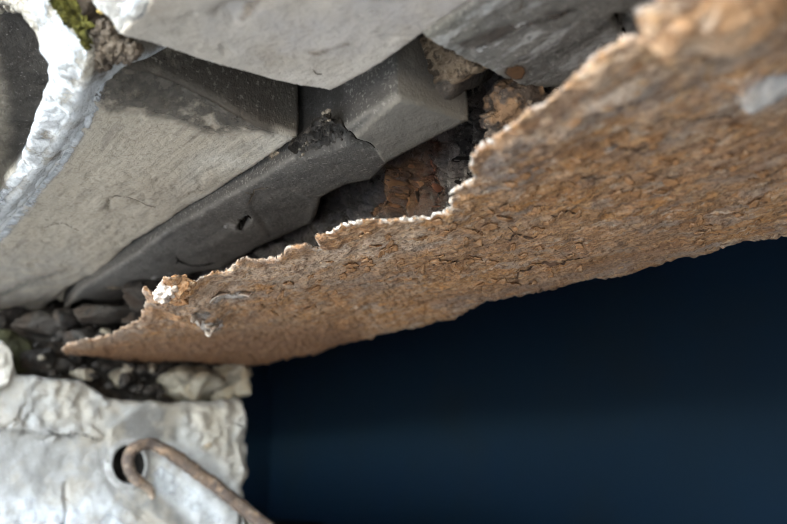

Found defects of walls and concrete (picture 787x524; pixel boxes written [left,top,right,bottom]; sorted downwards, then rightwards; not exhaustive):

rust [474,66,558,141]
spalling [288,108,375,158]
rust [370,140,453,217]
rust [339,231,405,281]
rust [413,194,534,276]
peeling [210,291,255,304]
peeling [190,312,223,337]
spalling [0,343,14,387]